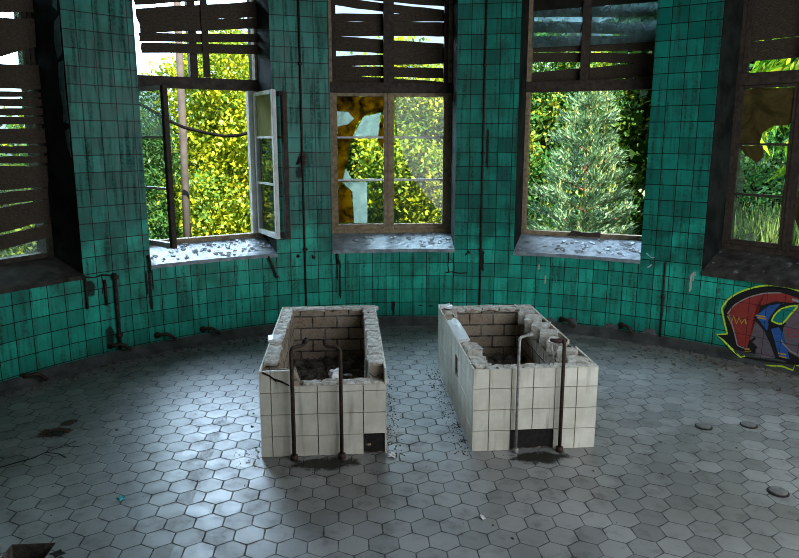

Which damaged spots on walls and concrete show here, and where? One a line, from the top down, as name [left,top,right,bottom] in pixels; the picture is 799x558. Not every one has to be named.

spalling [1,543,66,558]